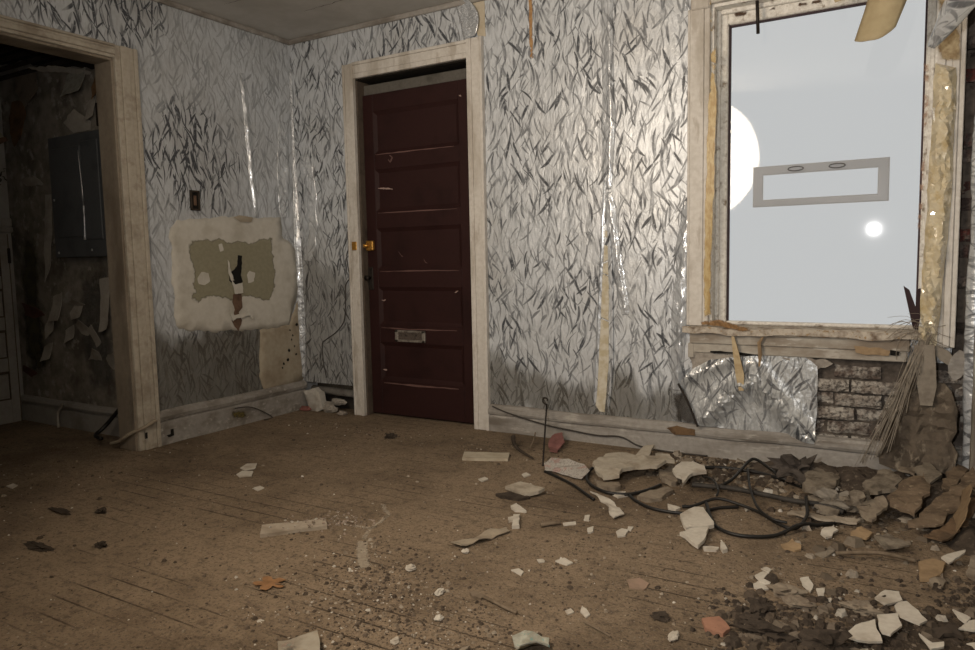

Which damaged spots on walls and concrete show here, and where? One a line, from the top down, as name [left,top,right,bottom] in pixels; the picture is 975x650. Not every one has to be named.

peeling [854,0,907,42]
peeling [63,95,96,133]
spalling [229,255,243,284]
flaking render [936,8,975,449]
peeling [40,277,115,370]
flaking render [807,358,918,441]